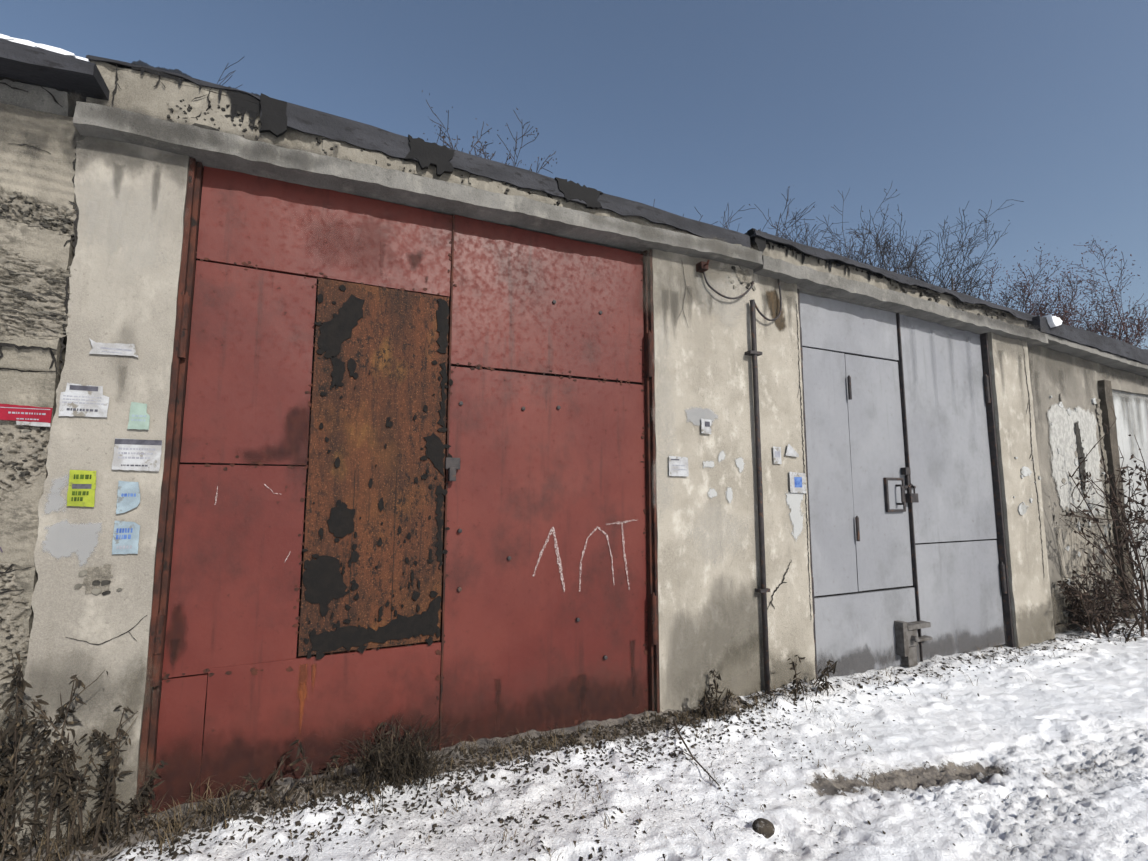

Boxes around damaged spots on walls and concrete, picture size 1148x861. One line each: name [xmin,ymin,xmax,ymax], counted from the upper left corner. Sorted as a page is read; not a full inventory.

spalling [167,98,260,141]
spalling [0,185,79,237]
spalling [0,247,77,341]
crack [0,143,79,375]
corrosion [361,219,457,299]
peeling [1013,394,1117,618]